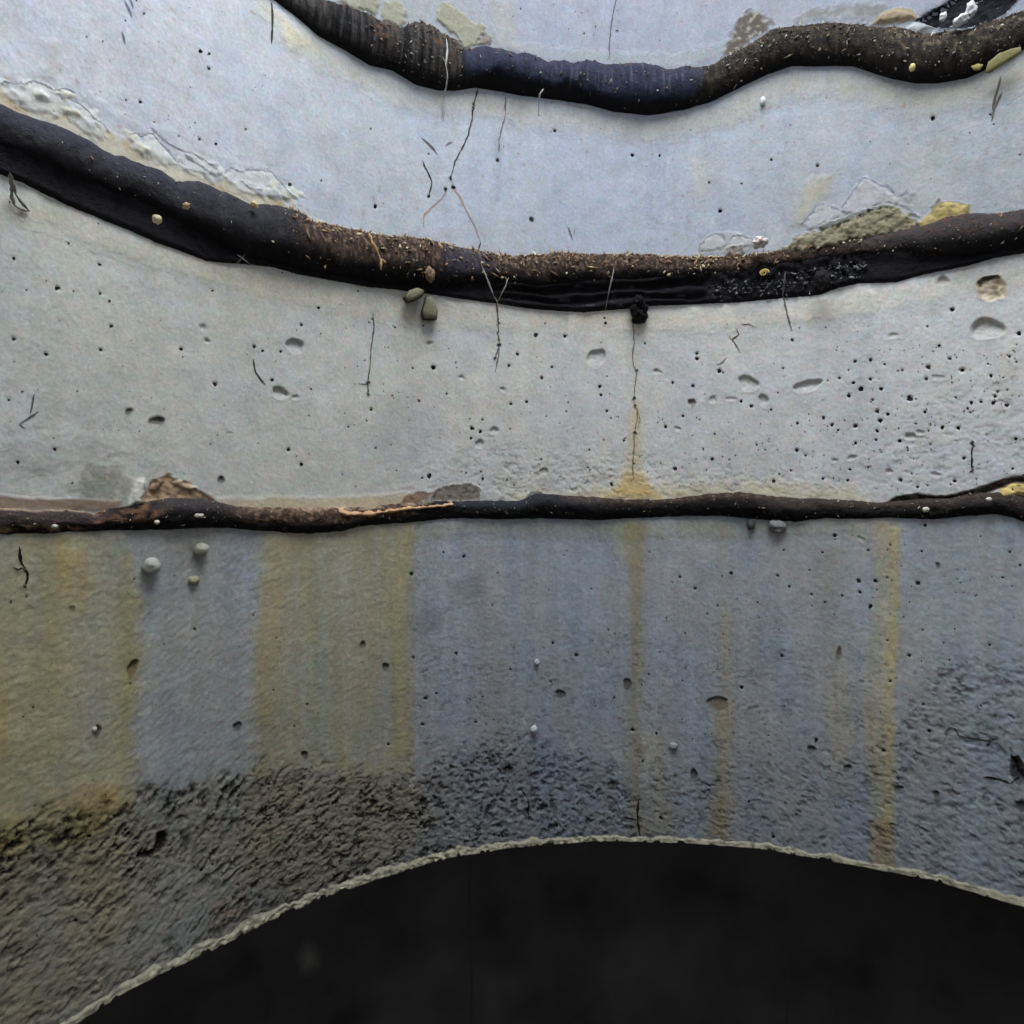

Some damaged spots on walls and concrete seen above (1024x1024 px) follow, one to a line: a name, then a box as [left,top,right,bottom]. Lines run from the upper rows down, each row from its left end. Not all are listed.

peeling [336,0,508,50]
peeling [0,75,336,225]
crack [423,89,481,248]
crack [495,96,506,162]
peeling [696,209,755,257]
peeling [800,174,923,231]
crack [493,303,502,372]
crack [631,323,641,475]
damp [0,530,162,1024]
damp [233,516,907,911]